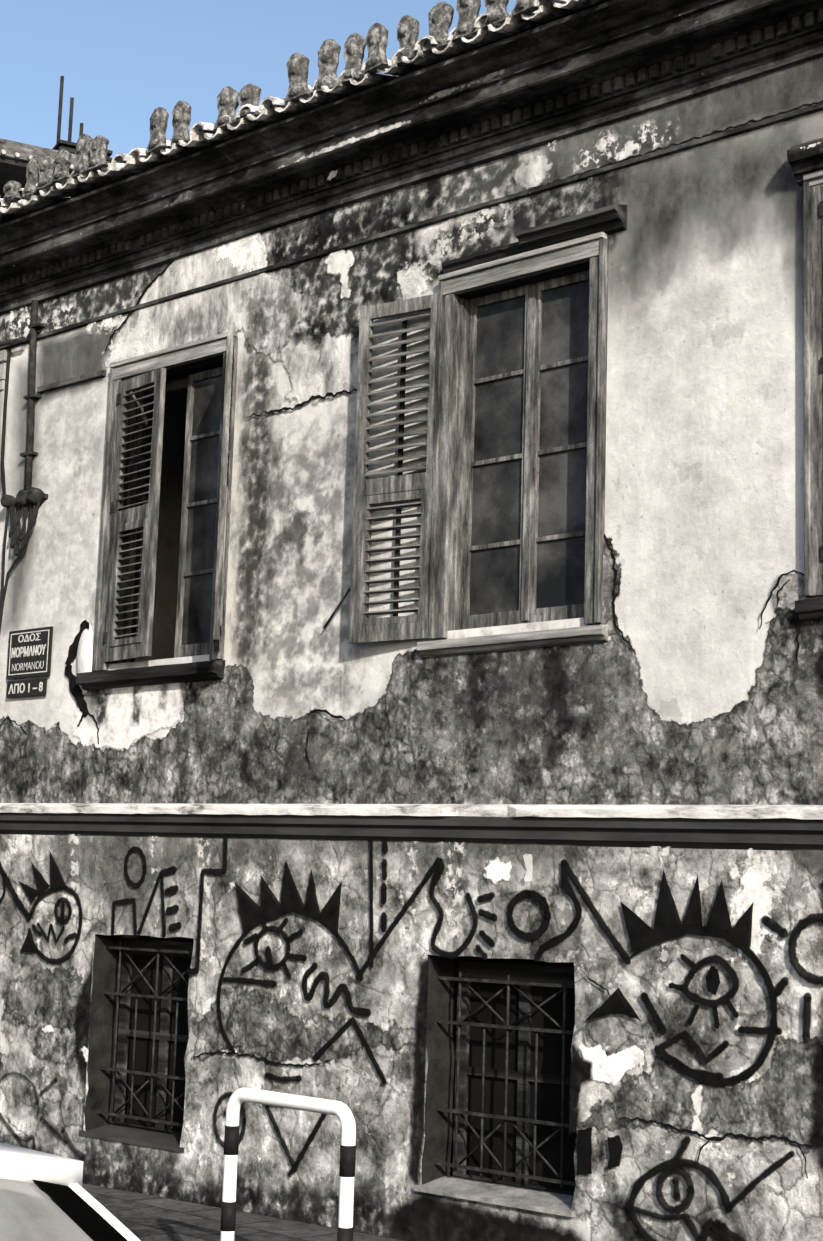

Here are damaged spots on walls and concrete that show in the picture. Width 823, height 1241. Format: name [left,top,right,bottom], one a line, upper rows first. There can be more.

leakage [0,260,175,399]
crack [246,389,357,418]
leakage [236,343,278,677]
leakage [283,516,307,544]
flaking render [0,537,823,805]
crack [191,1050,331,1068]
flaking render [569,1024,823,1173]
crack [621,1117,818,1178]